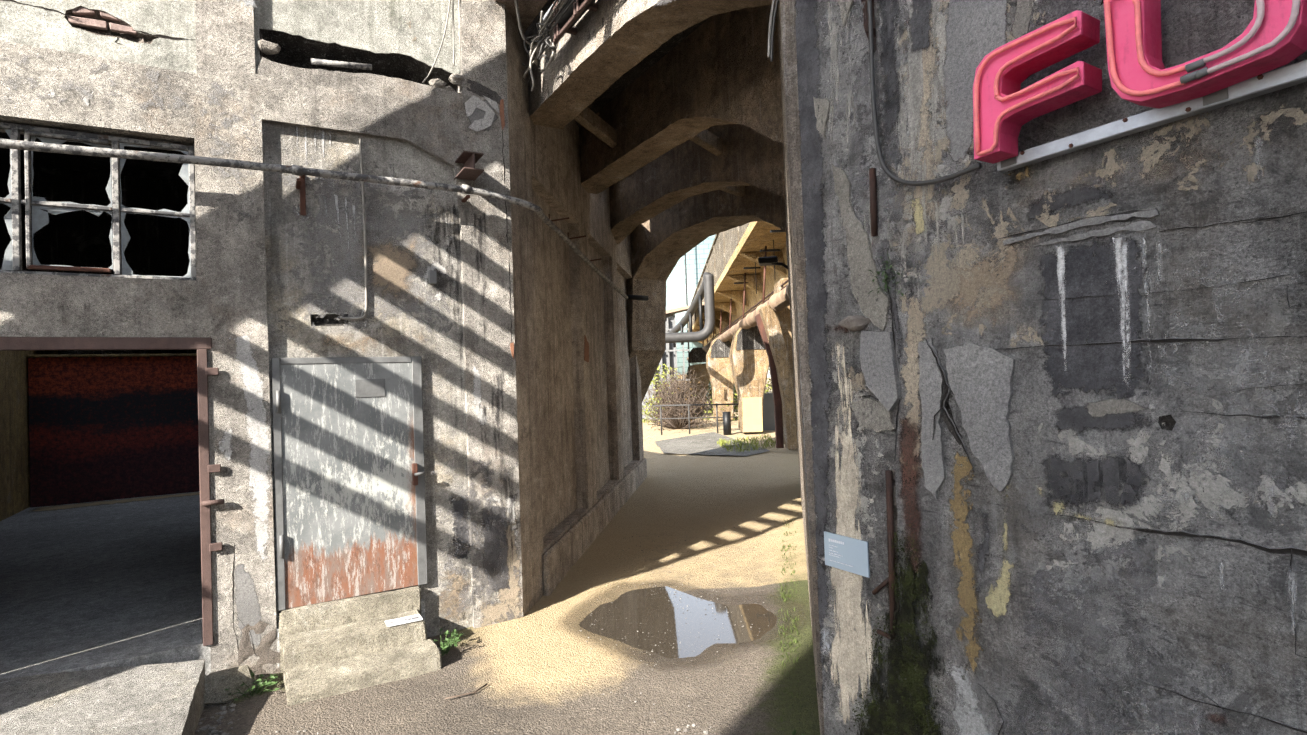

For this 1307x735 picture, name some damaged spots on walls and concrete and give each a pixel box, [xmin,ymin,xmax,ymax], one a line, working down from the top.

crack [2,0,79,20]
crack [115,30,194,46]
spalling [259,29,505,132]
flaking render [813,97,830,138]
spalling [906,2,939,230]
flaking render [831,163,927,640]
leakage [794,0,1307,735]
spalling [949,451,984,672]
crack [1042,513,1307,658]
crack [1142,681,1307,734]